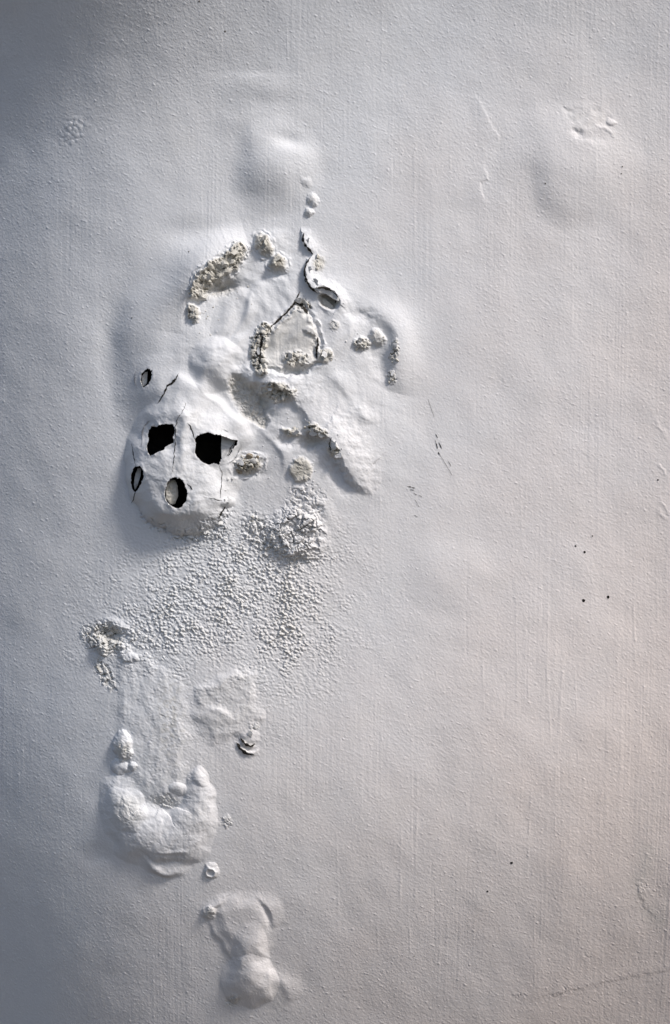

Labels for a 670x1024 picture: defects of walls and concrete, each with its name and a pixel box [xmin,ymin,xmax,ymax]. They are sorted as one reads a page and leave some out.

peeling [168,174,413,430]